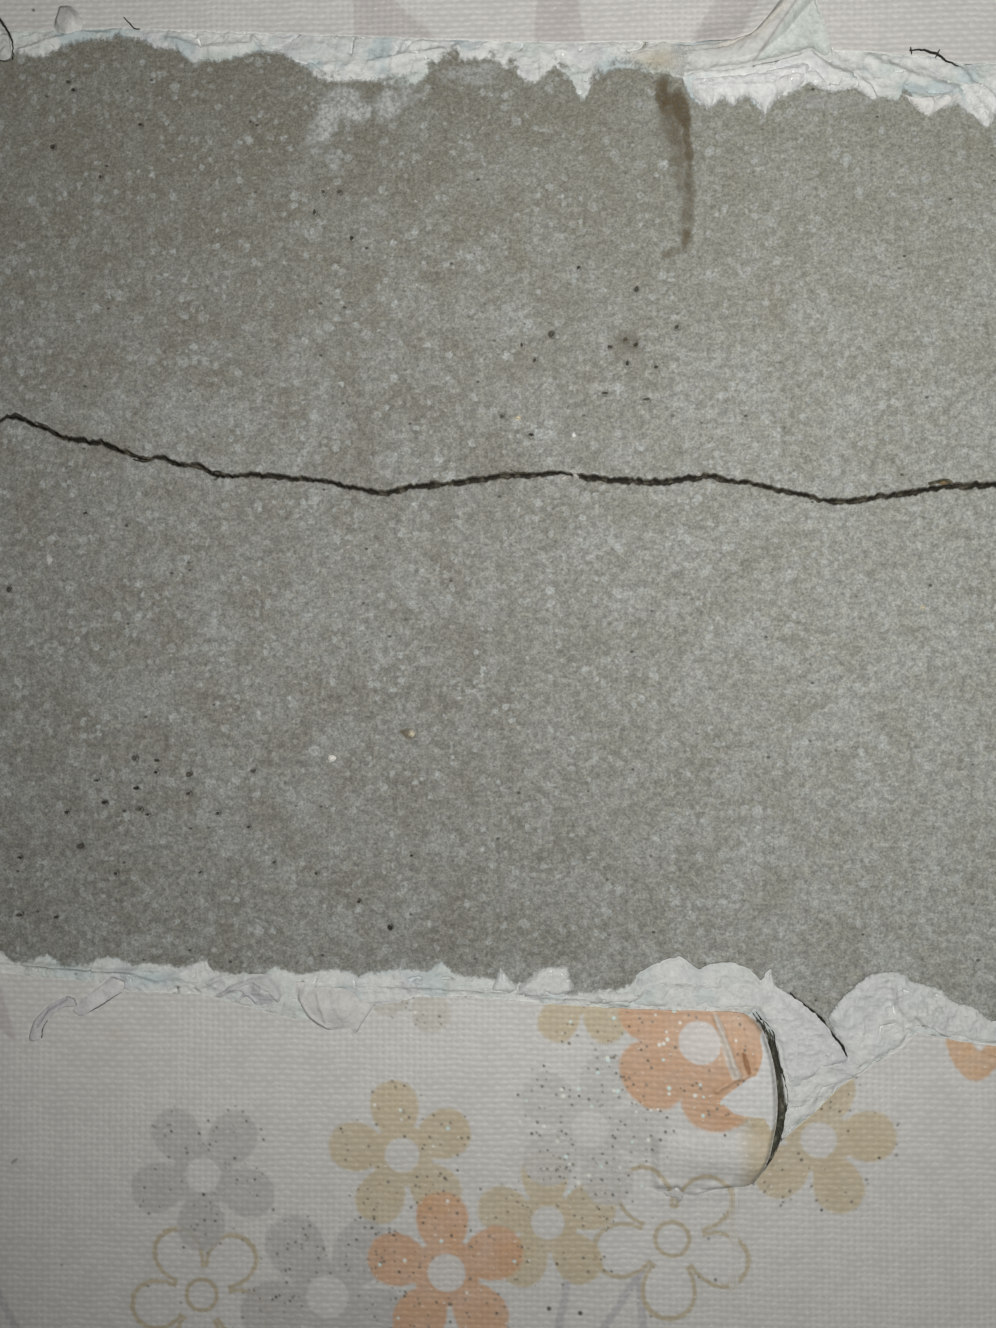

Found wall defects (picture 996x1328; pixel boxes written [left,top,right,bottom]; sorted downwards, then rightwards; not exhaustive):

peeling [0,18,14,61]
peeling [54,5,83,34]
peeling [675,0,833,76]
crack [0,413,996,505]
peeling [29,977,125,1040]
peeling [828,972,996,1069]
peeling [781,1073,836,1138]